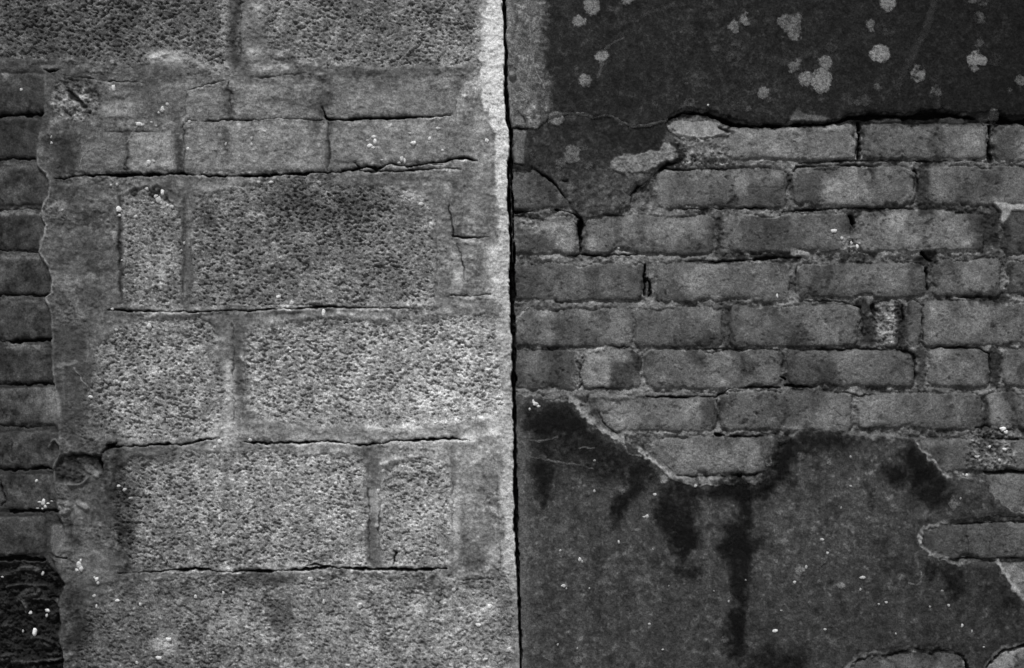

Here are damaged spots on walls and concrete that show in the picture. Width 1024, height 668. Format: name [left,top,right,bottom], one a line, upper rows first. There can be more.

crack [513,163,583,219]
damp [654,425,861,668]
spalling [513,109,1024,601]
damp [885,442,949,508]